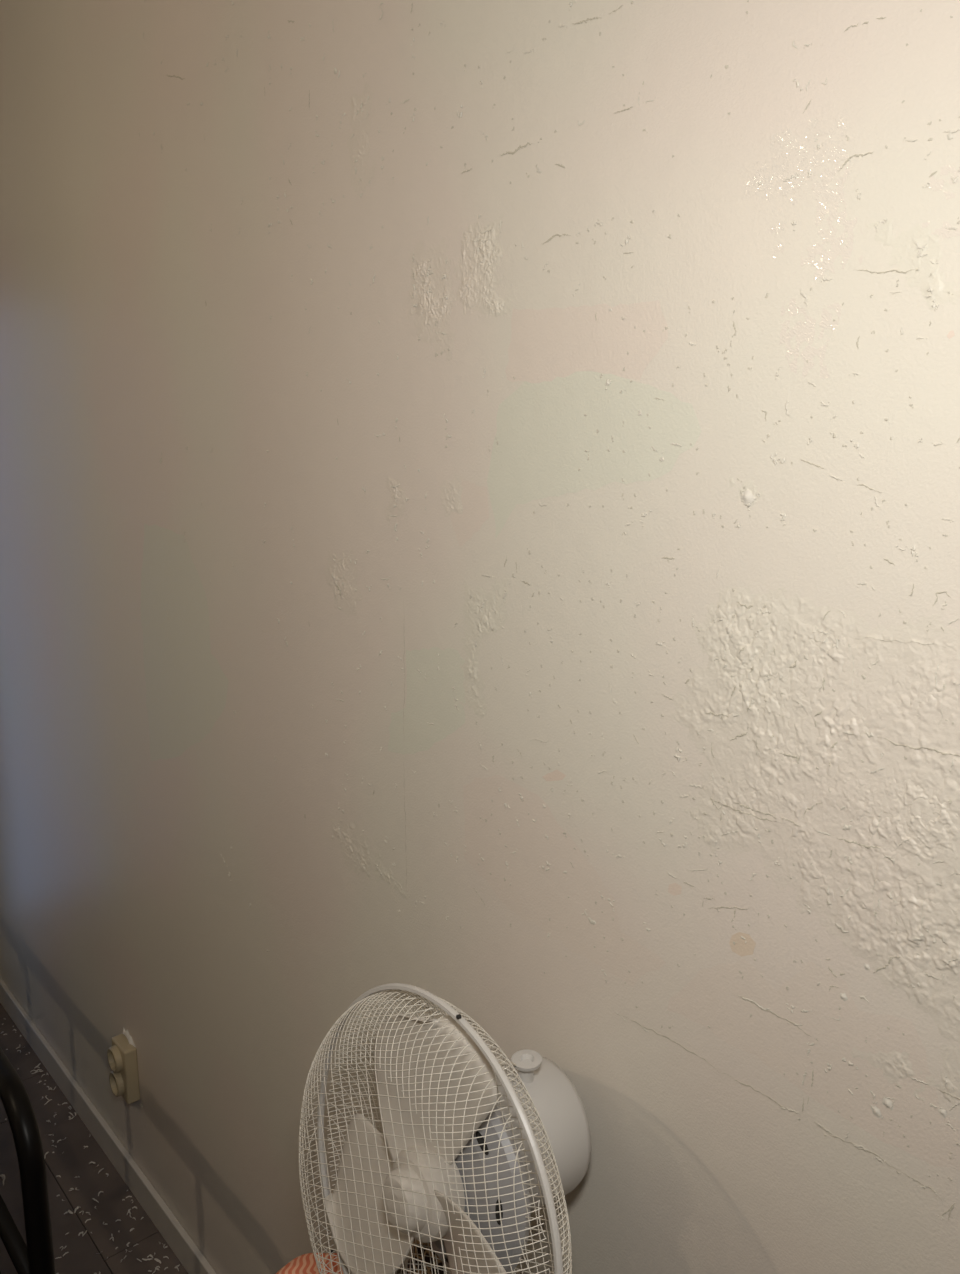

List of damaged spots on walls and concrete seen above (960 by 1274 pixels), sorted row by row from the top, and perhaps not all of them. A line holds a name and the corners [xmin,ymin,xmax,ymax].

crack [624,1016,960,1220]